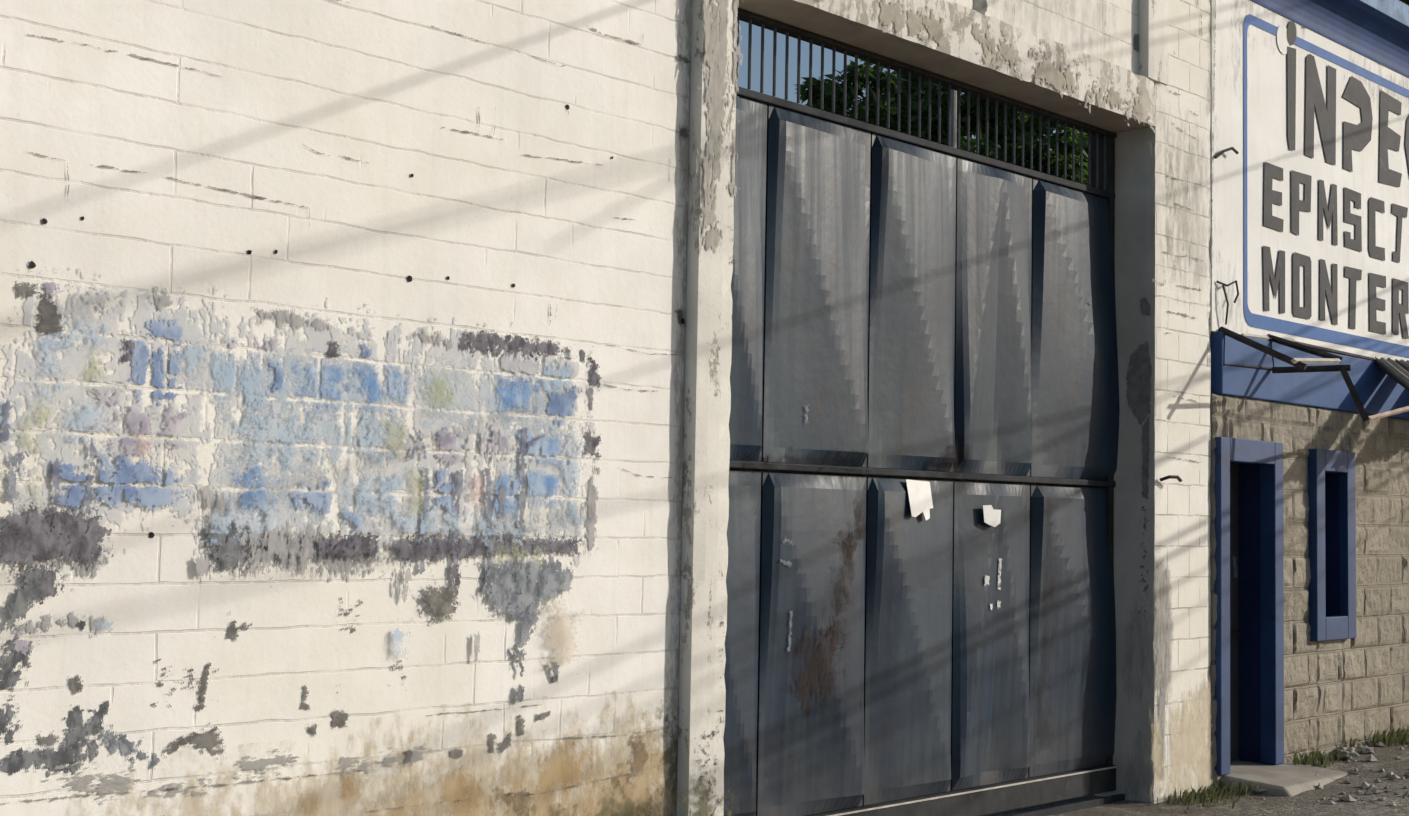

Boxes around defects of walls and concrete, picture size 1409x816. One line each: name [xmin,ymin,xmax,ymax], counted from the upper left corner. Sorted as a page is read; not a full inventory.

peeling [696,0,744,253]
peeling [879,0,947,46]
peeling [967,0,1156,133]
peeling [0,264,604,802]
damp [1138,506,1214,793]